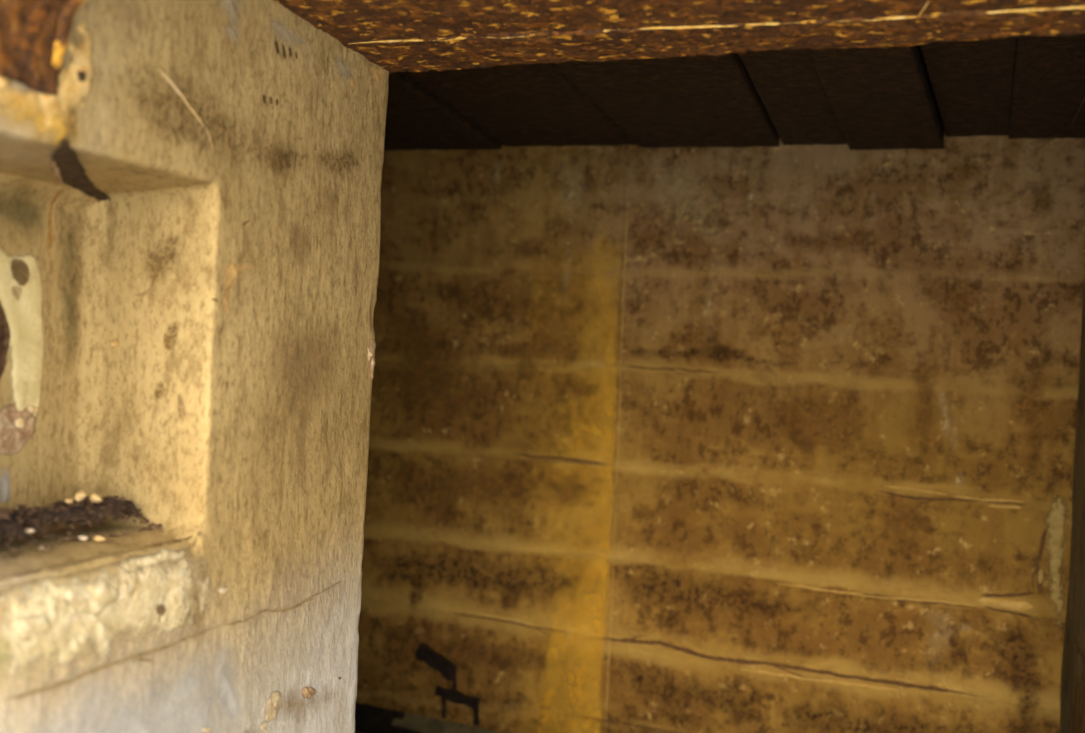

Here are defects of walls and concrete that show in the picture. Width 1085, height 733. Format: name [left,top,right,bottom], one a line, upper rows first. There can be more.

crack [876,486,1026,509]
crack [0,581,342,701]
damp [384,554,607,733]
damp [634,573,801,626]
crack [454,613,983,697]
crack [776,526,1047,617]
damp [782,703,962,733]